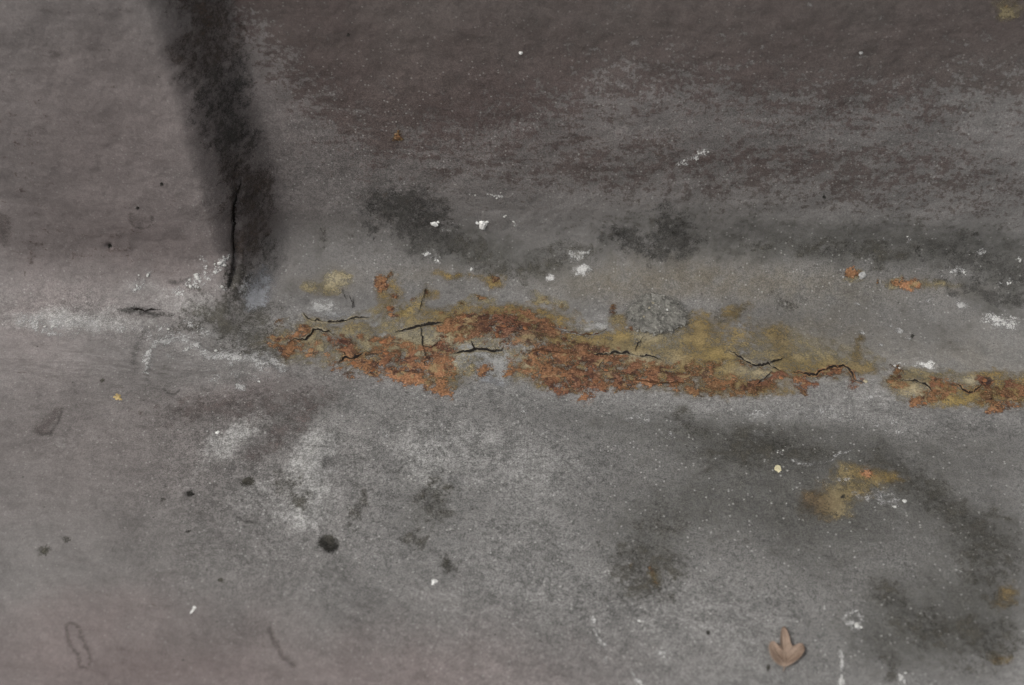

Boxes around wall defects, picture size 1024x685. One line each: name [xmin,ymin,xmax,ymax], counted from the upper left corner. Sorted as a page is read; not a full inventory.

leakage [2,0,333,460]
crack [231,180,241,264]
leakage [367,181,707,286]
crack [292,293,369,363]
crack [395,288,687,384]
corrosion [264,271,1024,414]
crack [727,350,862,385]
crack [899,378,932,391]
crack [958,384,981,394]
corrosion [836,463,904,487]